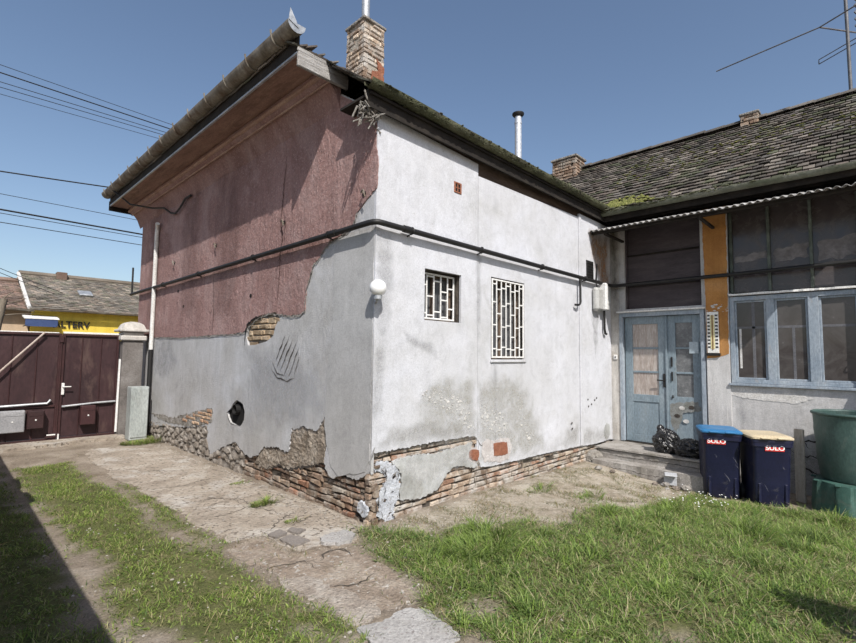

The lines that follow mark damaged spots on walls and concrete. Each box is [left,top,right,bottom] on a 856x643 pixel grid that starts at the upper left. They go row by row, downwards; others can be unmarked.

spalling [155,213,357,346]
flaking render [218,387,611,526]